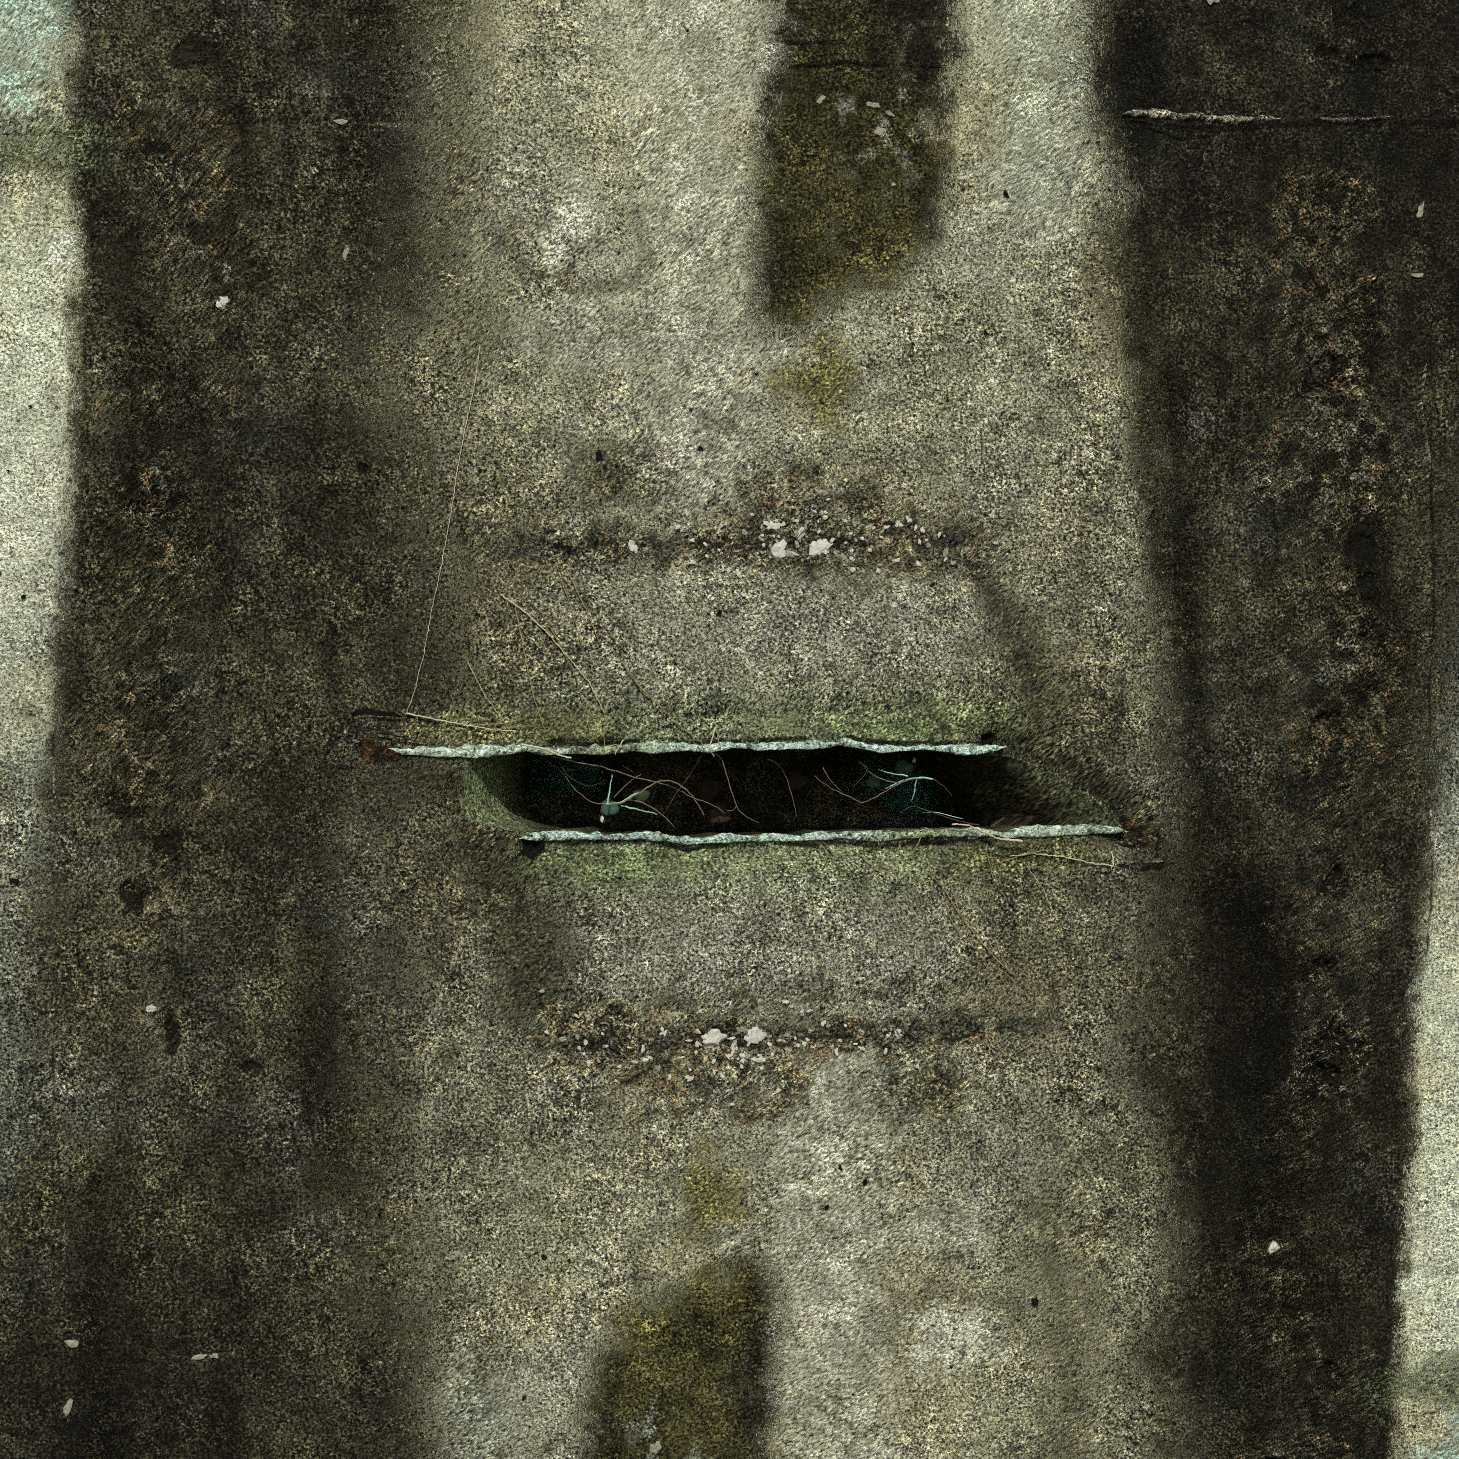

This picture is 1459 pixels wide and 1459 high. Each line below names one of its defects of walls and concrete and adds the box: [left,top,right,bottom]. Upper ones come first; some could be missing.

water stain [957,558,1066,727]
water stain [0,0,816,1459]
crack [533,734,997,746]
water stain [985,0,1459,1459]
crack [520,837,995,852]
crack [1114,830,1166,871]